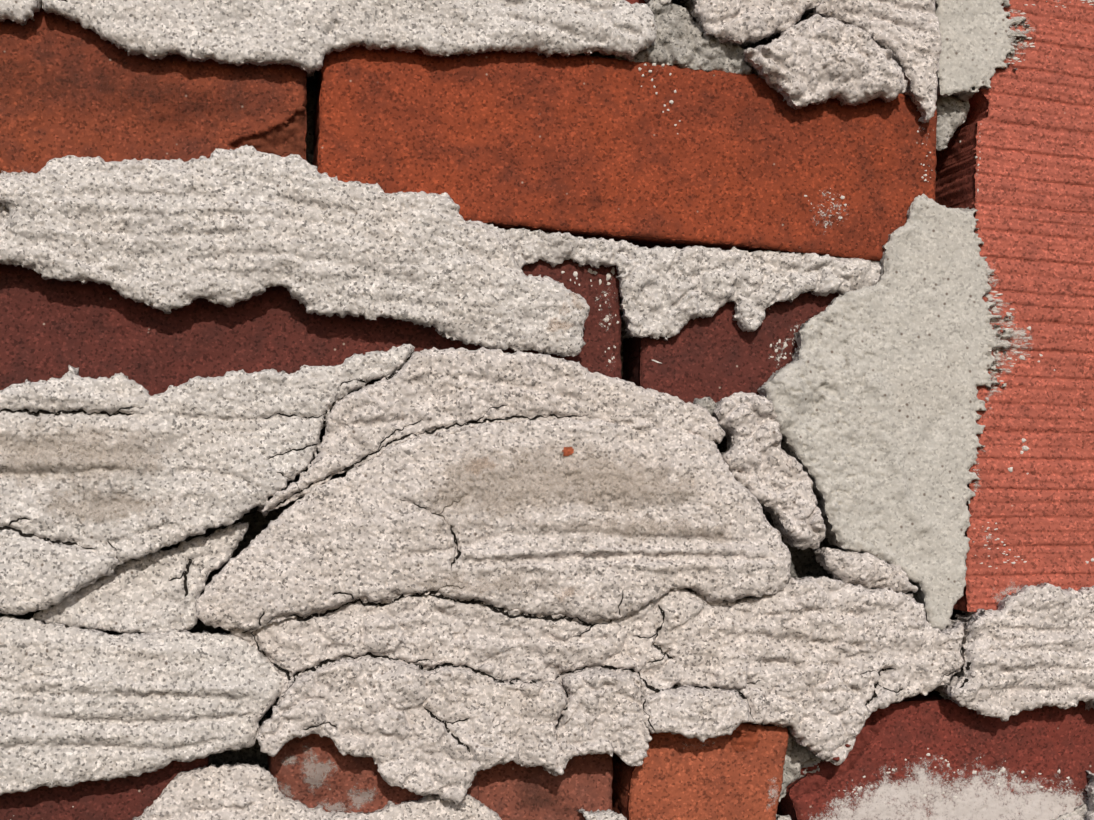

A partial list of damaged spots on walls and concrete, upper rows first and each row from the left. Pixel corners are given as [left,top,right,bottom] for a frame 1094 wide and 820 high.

spalling [232,101,306,159]
crack [0,406,145,417]
crack [224,351,586,528]
crack [0,517,119,560]
crack [169,559,192,597]
crack [242,494,764,736]
crack [862,668,903,705]
crack [942,647,972,689]
crack [424,707,472,756]
spalling [727,730,758,752]
spalling [790,715,885,797]
efflorescence [810,748,1088,820]